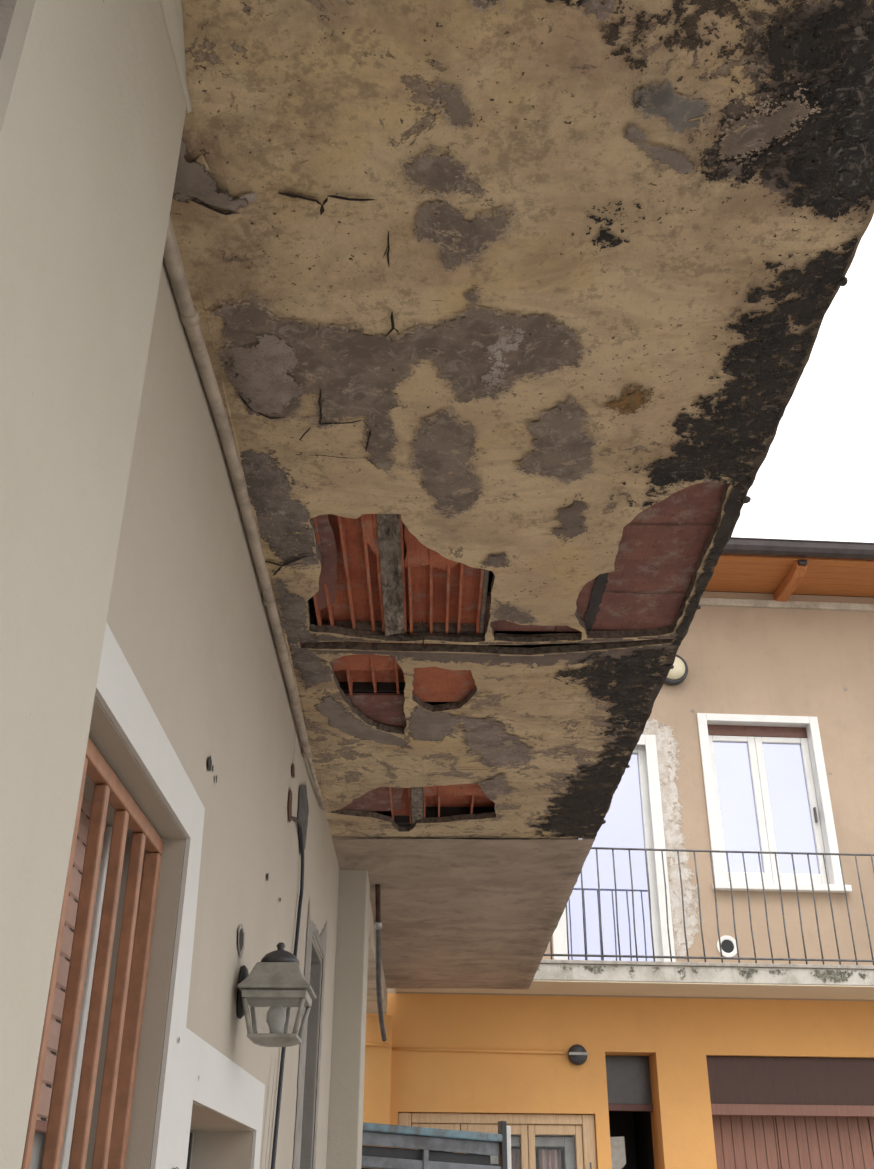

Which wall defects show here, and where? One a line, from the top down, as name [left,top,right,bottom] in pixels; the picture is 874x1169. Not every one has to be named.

peeling [569,0,821,174]
crack [171,197,243,233]
peeling [172,137,257,213]
crack [275,192,375,219]
crack [382,231,390,266]
crack [384,312,400,338]
crack [239,389,376,466]
water stain [295,0,874,839]
spalling [240,450,726,826]
peeling [293,901,327,1169]